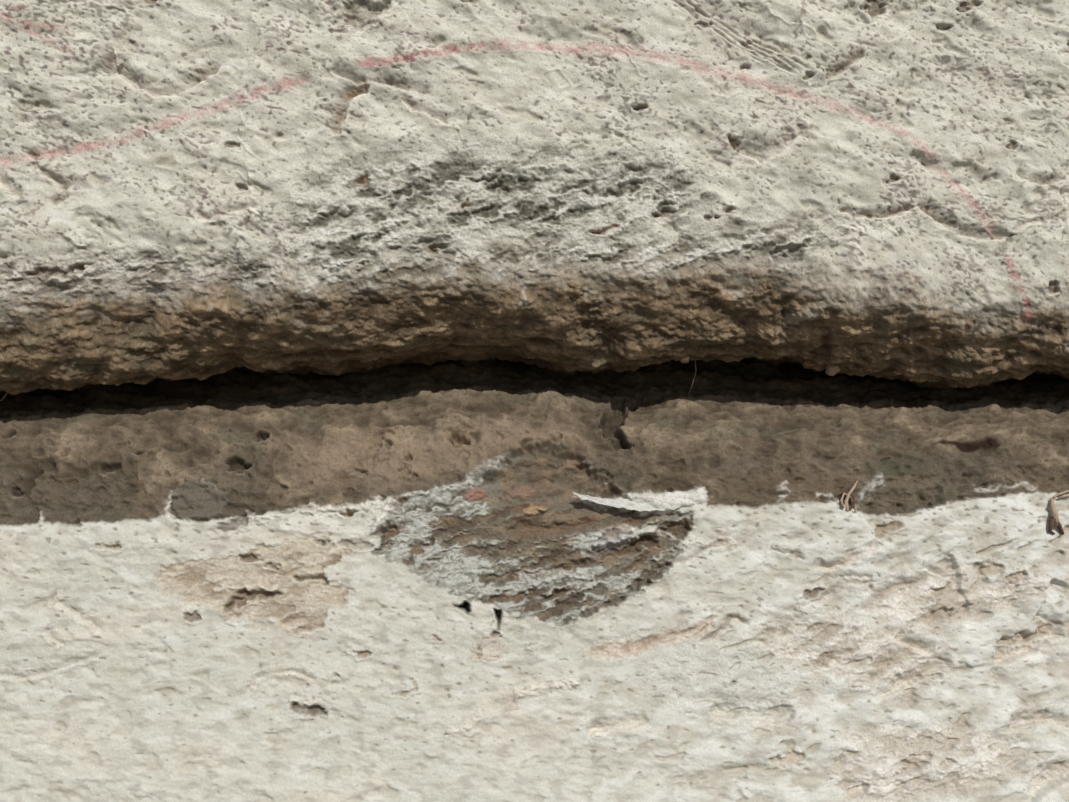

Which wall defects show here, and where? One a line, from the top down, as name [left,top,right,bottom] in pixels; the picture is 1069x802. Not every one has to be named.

spalling [594,396,645,454]
flaking render [88,540,128,556]
spalling [156,418,739,638]
spalling [849,468,947,545]